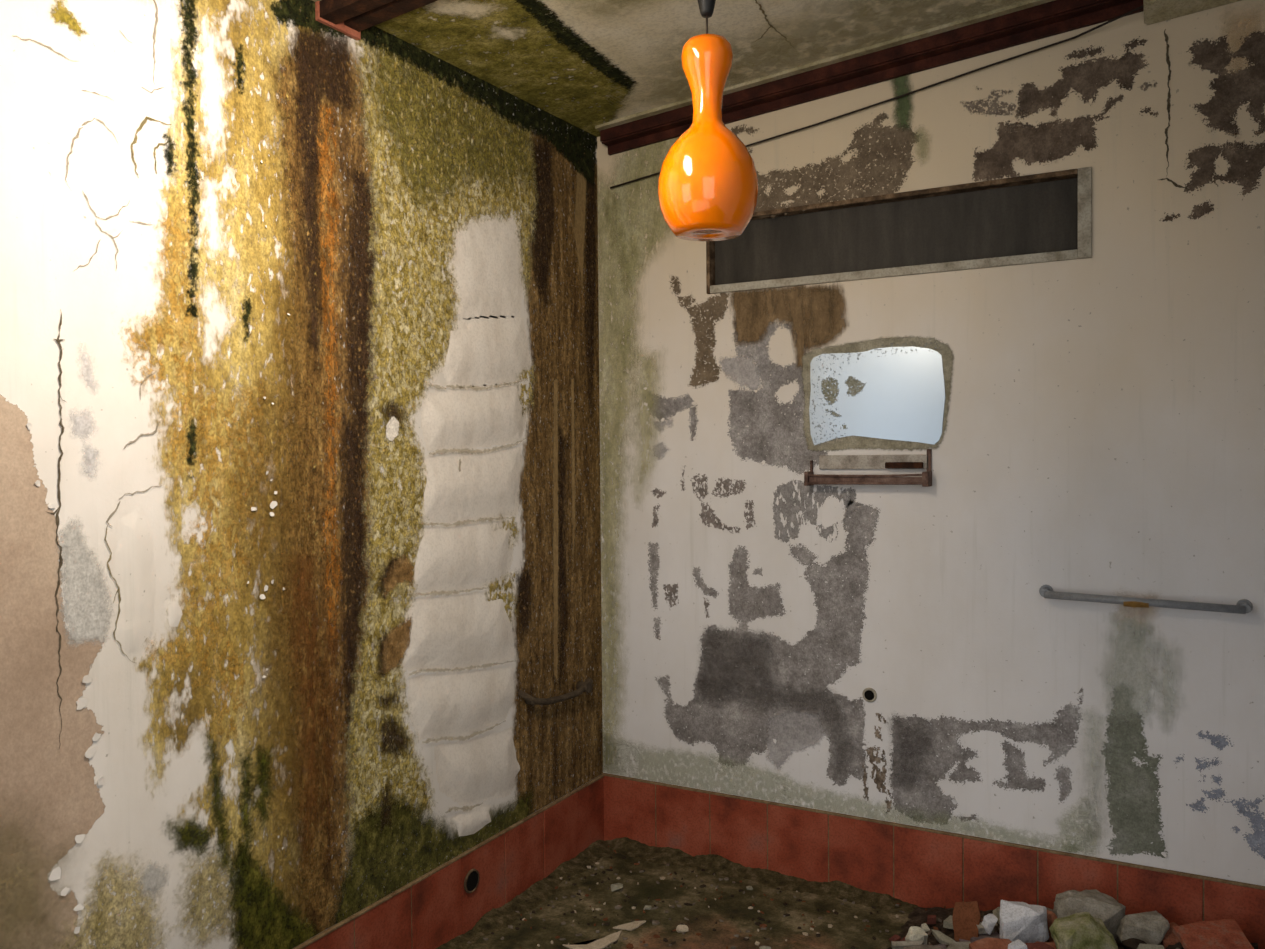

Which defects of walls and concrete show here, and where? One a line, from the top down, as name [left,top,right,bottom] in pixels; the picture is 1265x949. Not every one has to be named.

crack [16,36,72,61]
crack [65,0,173,271]
damp [614,137,679,281]
peeling [960,36,1157,183]
crack [1160,29,1187,189]
peeling [1159,31,1265,221]
spalling [0,395,110,949]
crack [48,309,66,748]
damp [127,30,383,945]
rust [296,106,342,812]
damp [486,129,603,817]
peeling [641,276,1083,825]